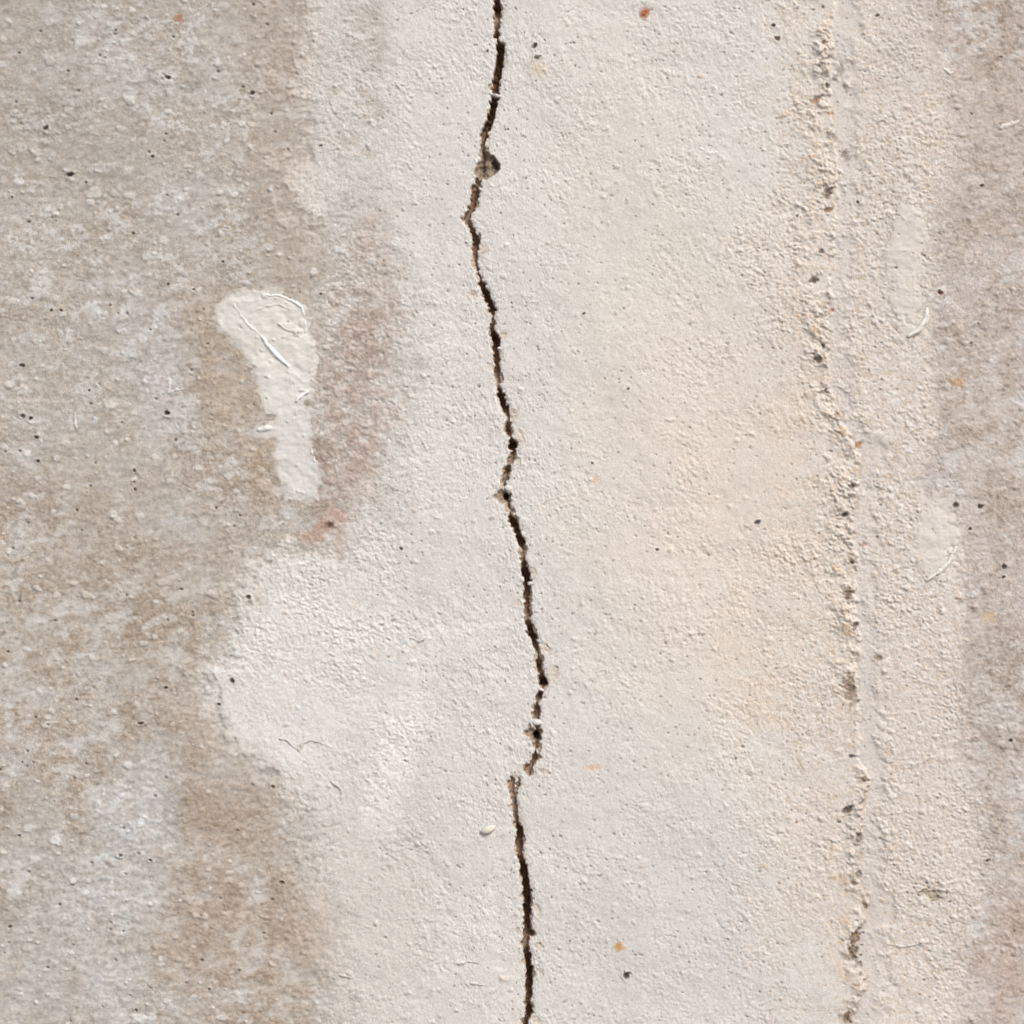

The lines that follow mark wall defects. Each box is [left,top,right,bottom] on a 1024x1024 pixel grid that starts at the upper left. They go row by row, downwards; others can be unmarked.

water stain [0,0,418,1024]
crack [459,0,560,1024]